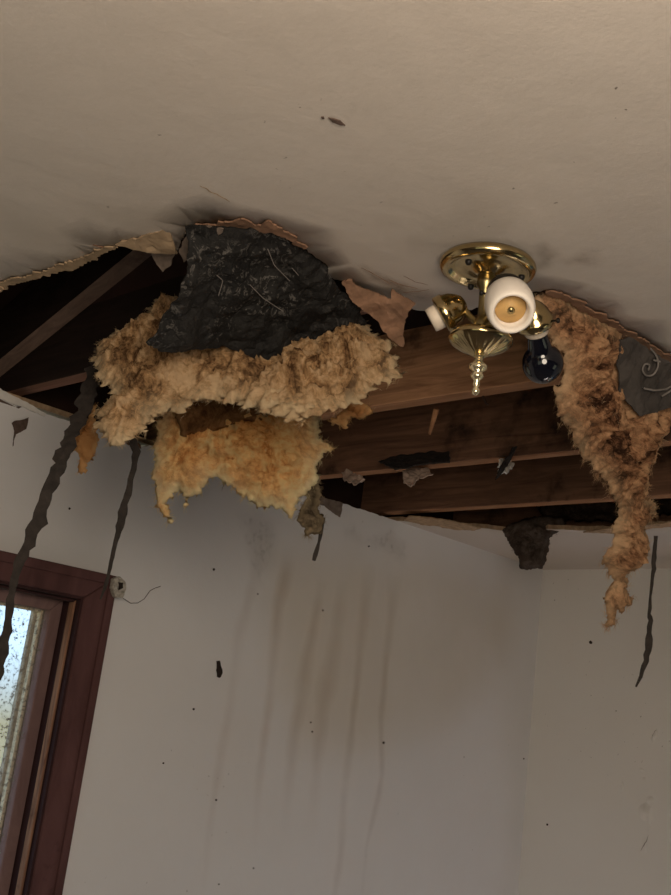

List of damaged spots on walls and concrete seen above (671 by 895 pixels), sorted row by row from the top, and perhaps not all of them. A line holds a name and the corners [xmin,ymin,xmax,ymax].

spalling [195,217,308,249]
spalling [0,245,118,290]
spalling [545,290,671,363]
peeling [12,417,29,446]
spalling [319,497,343,517]